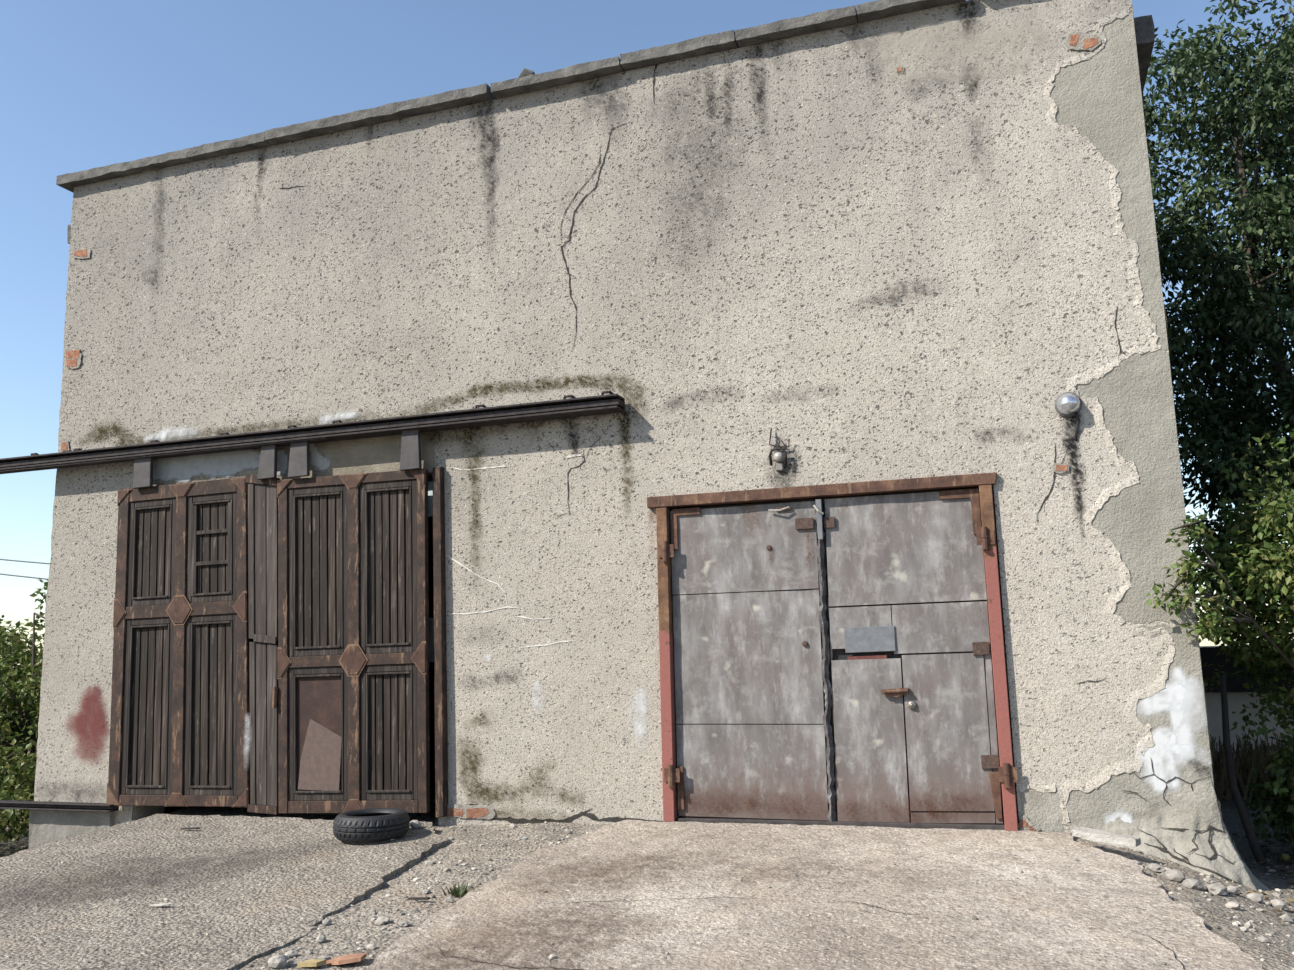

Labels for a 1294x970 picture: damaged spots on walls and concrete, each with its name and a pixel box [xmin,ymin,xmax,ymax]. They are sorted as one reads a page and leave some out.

damp [478,102,497,196]
crack [560,122,629,352]
damp [1063,415,1083,533]
flaking render [1018,10,1214,832]
damp [1138,677,1202,793]
crack [1121,760,1242,885]